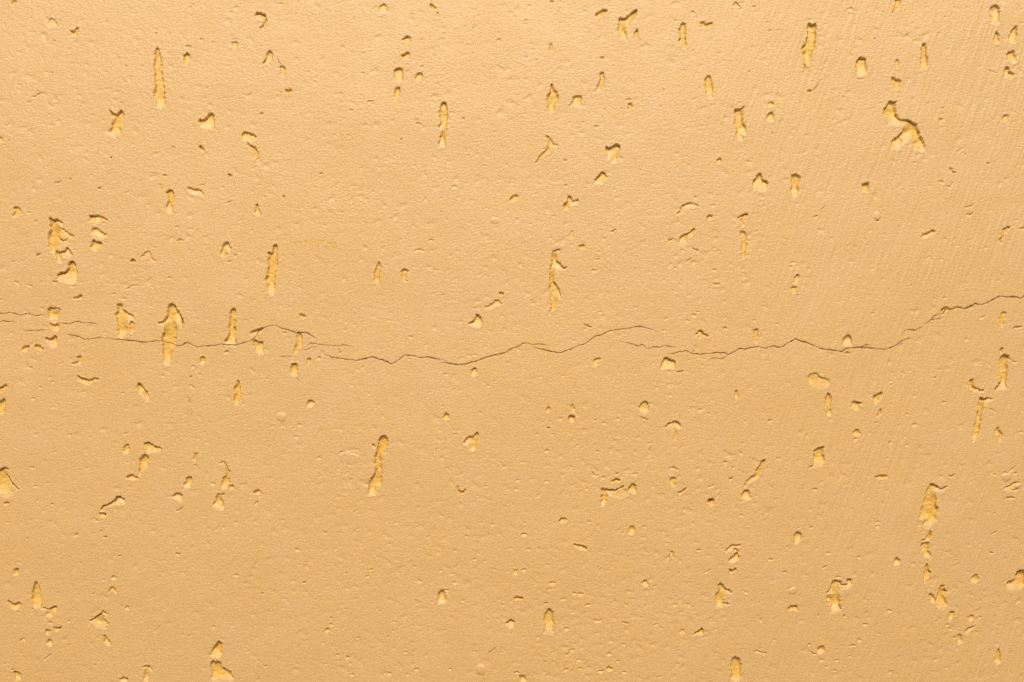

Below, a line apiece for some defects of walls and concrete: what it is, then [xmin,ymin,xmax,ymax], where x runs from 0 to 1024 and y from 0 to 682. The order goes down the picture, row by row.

spalling [152,46,166,112]
spalling [436,101,450,150]
spalling [800,21,819,74]
hole [881,58,927,154]
spalling [46,215,83,302]
spalling [262,243,280,297]
hole [546,248,569,317]
hole [155,302,186,368]
crack [0,295,1024,381]
spalling [968,346,1012,445]
hole [367,433,390,499]
spalling [919,482,977,646]